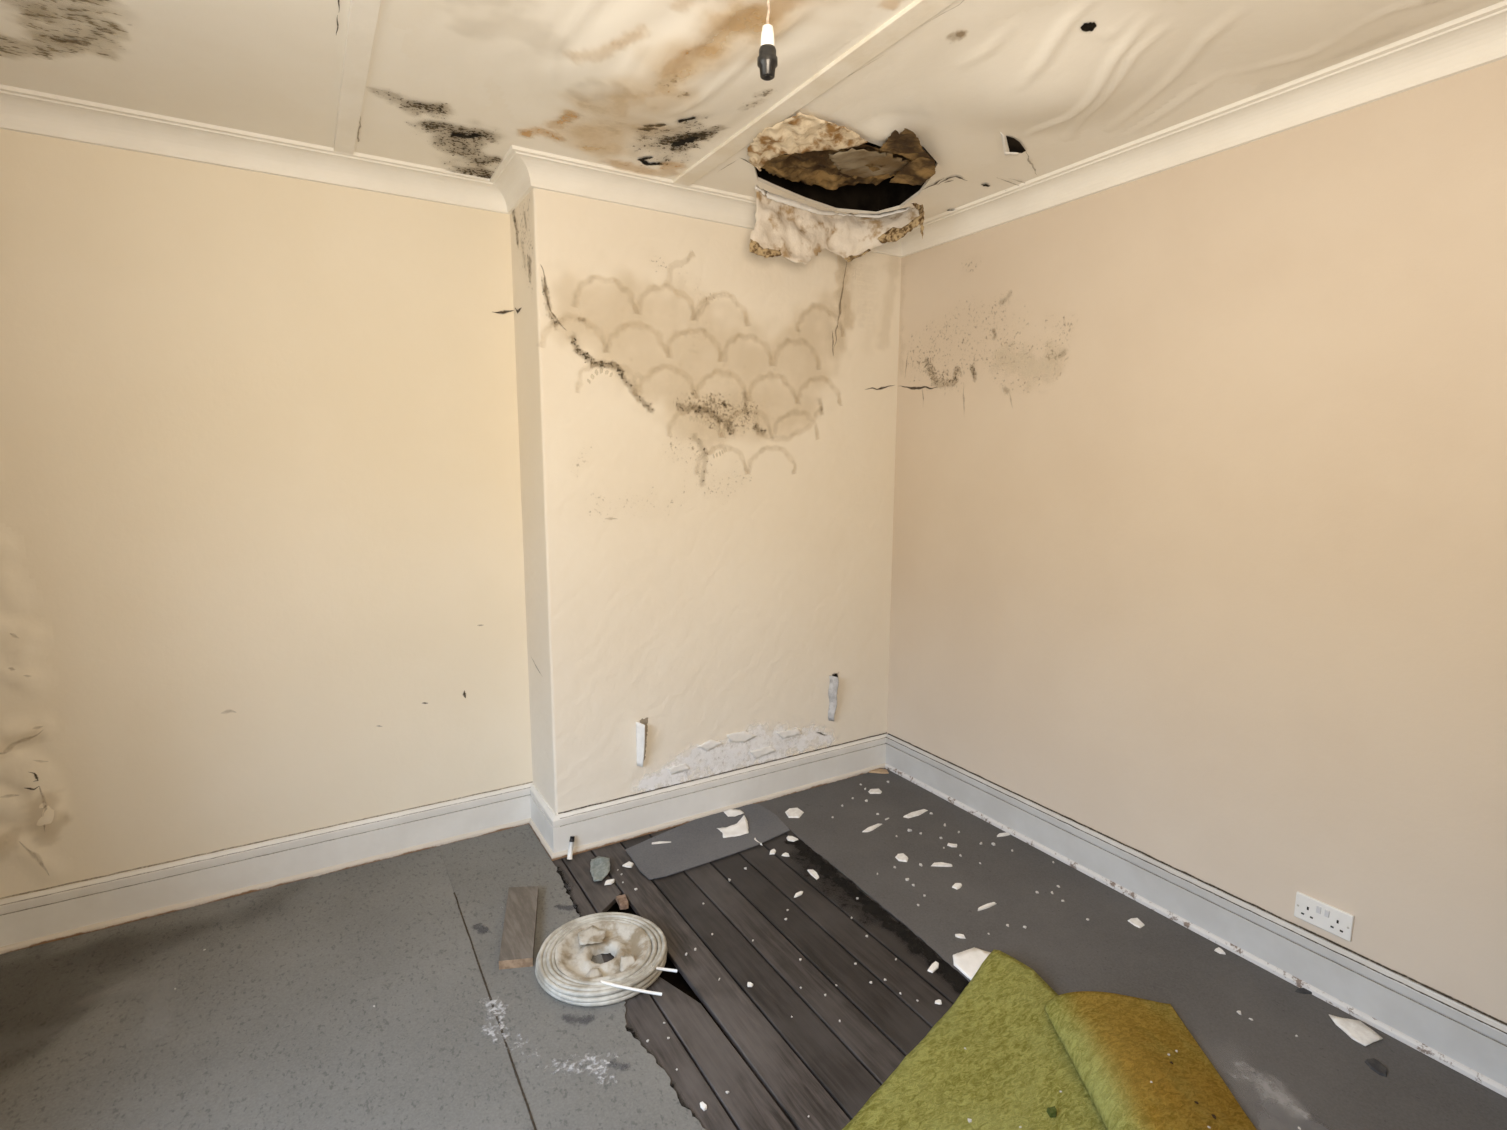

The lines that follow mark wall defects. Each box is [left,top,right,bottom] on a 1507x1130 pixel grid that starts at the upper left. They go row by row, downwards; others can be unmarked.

damp [0,0,126,58]
damp [376,91,501,178]
damp [521,114,577,140]
damp [633,117,720,167]
crack [494,266,566,330]
crack [832,262,847,355]
peeling [636,673,839,791]